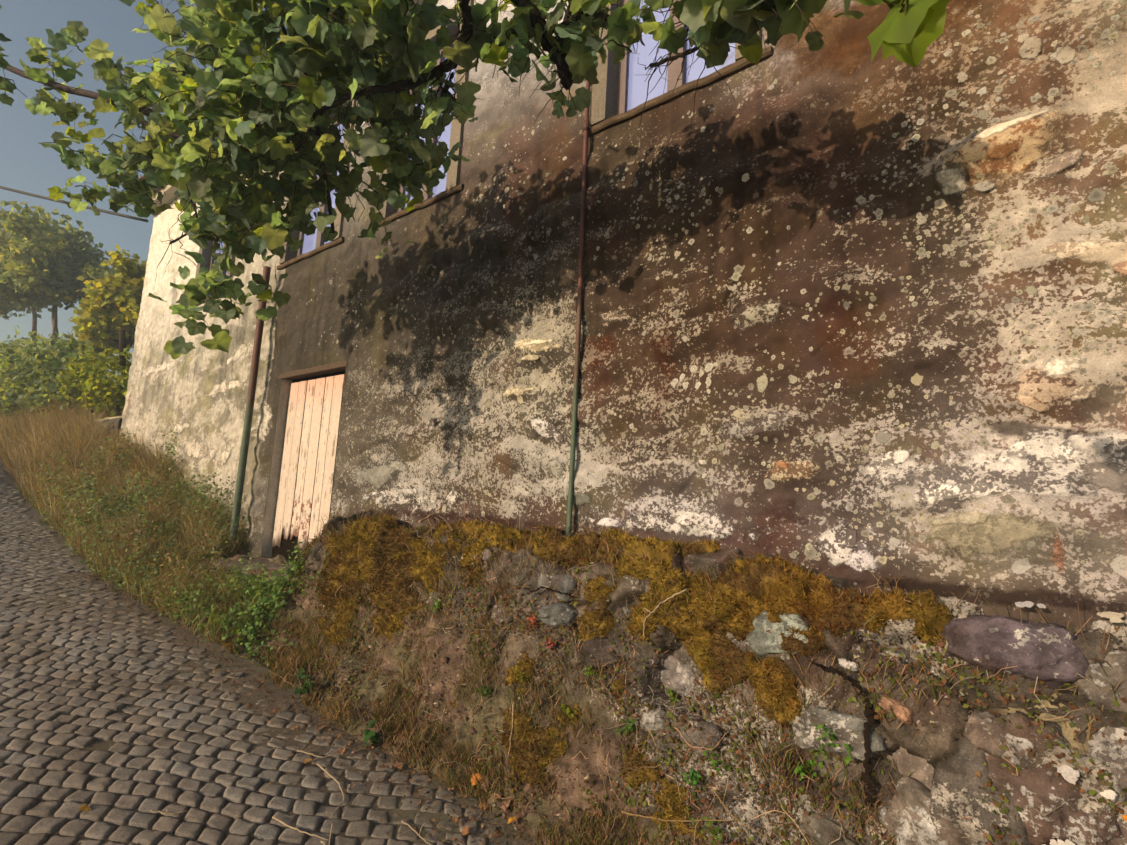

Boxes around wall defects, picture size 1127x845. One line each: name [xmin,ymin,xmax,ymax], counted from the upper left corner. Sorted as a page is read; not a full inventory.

flaking render [936,110,1082,195]